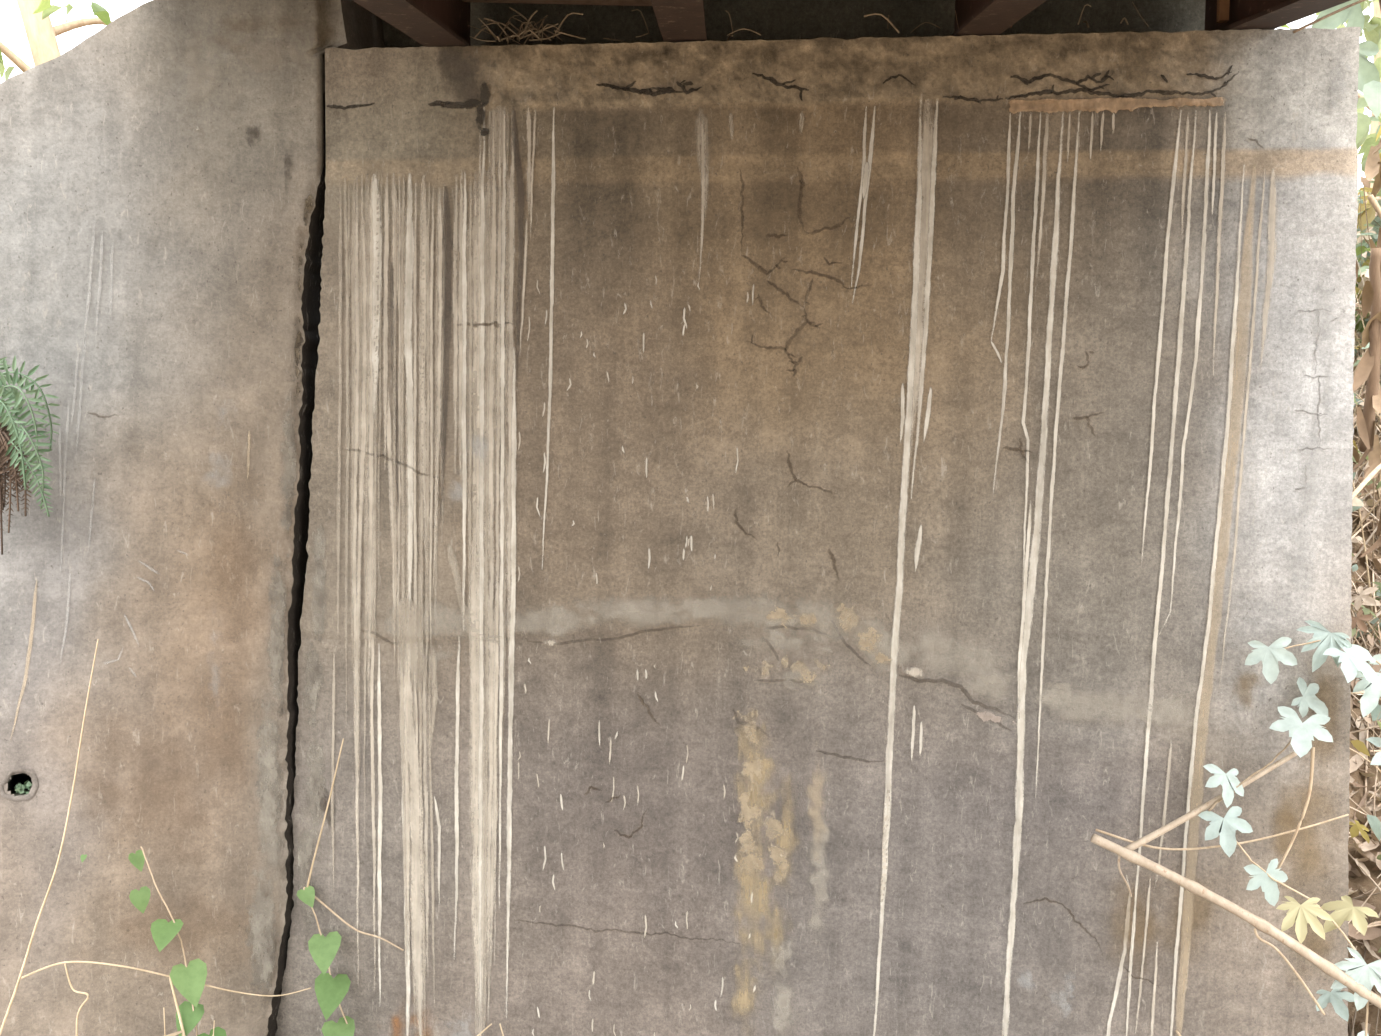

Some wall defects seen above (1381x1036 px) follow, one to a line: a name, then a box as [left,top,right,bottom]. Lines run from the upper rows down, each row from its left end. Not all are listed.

crack [596,80,702,96]
damp [623,81,693,95]
crack [752,73,809,101]
crack [883,65,1239,104]
damp [697,109,709,289]
crack [740,172,857,376]
damp [247,48,572,1036]
damp [743,99,938,1036]
damp [974,97,1276,1036]
damp [598,720,639,808]
damp [723,710,795,957]
damp [714,967,756,1013]